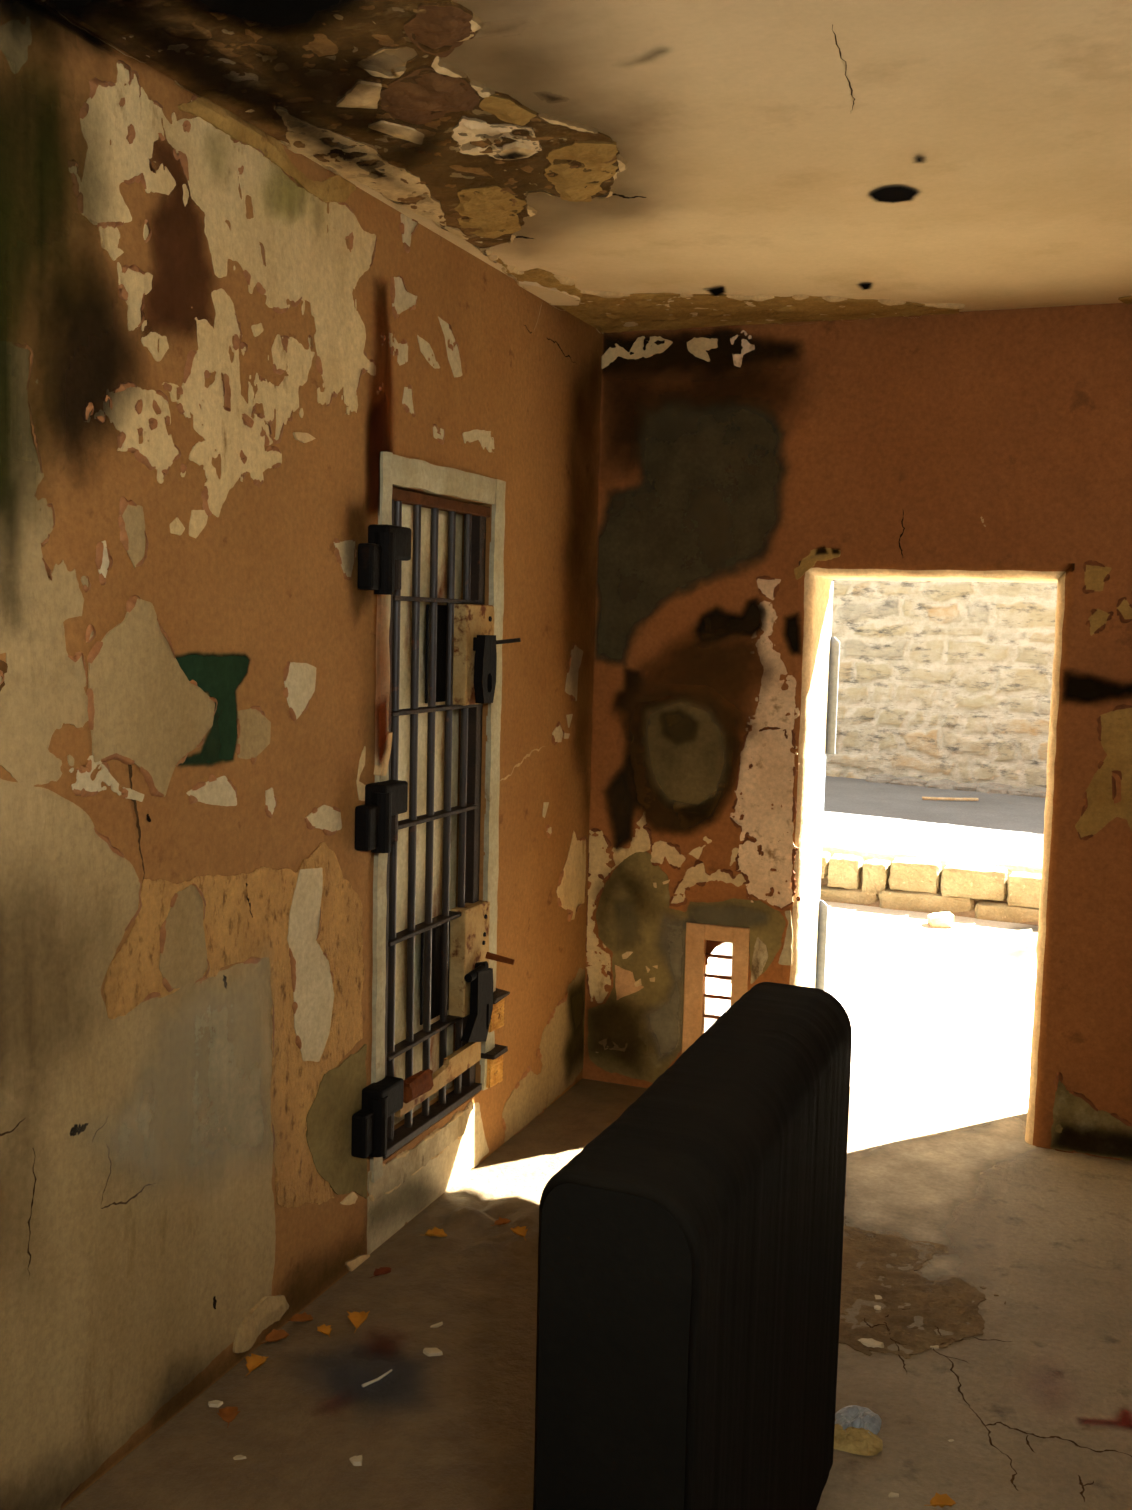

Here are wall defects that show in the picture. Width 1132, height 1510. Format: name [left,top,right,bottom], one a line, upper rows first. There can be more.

crack [832,25,855,111]
leakage [43,270,135,458]
spalling [72,0,965,538]
leakage [567,357,788,691]
leakage [615,637,765,834]
flaking render [0,343,841,1510]
spalling [839,1226,1006,1359]
crack [864,1308,1132,1502]